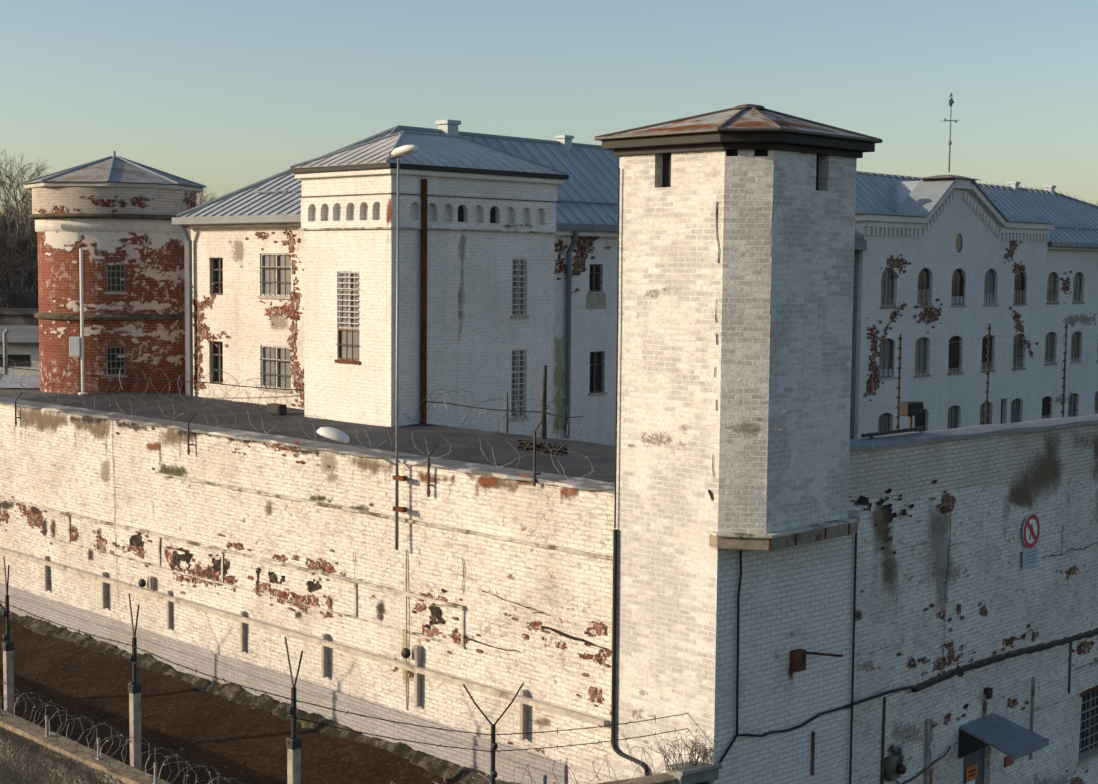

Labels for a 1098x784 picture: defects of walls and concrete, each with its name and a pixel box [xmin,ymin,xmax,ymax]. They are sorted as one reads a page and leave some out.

corrosion [635,120,716,133]
corrosion [734,113,833,132]
peeling [41,231,230,394]
spalling [228,229,304,408]
spalling [863,295,943,401]
damp [1009,435,1070,513]
spalling [0,496,52,545]
spalling [92,529,152,568]
spalling [164,533,345,618]
crack [448,559,606,652]
spalling [503,613,612,668]
damp [873,508,897,588]